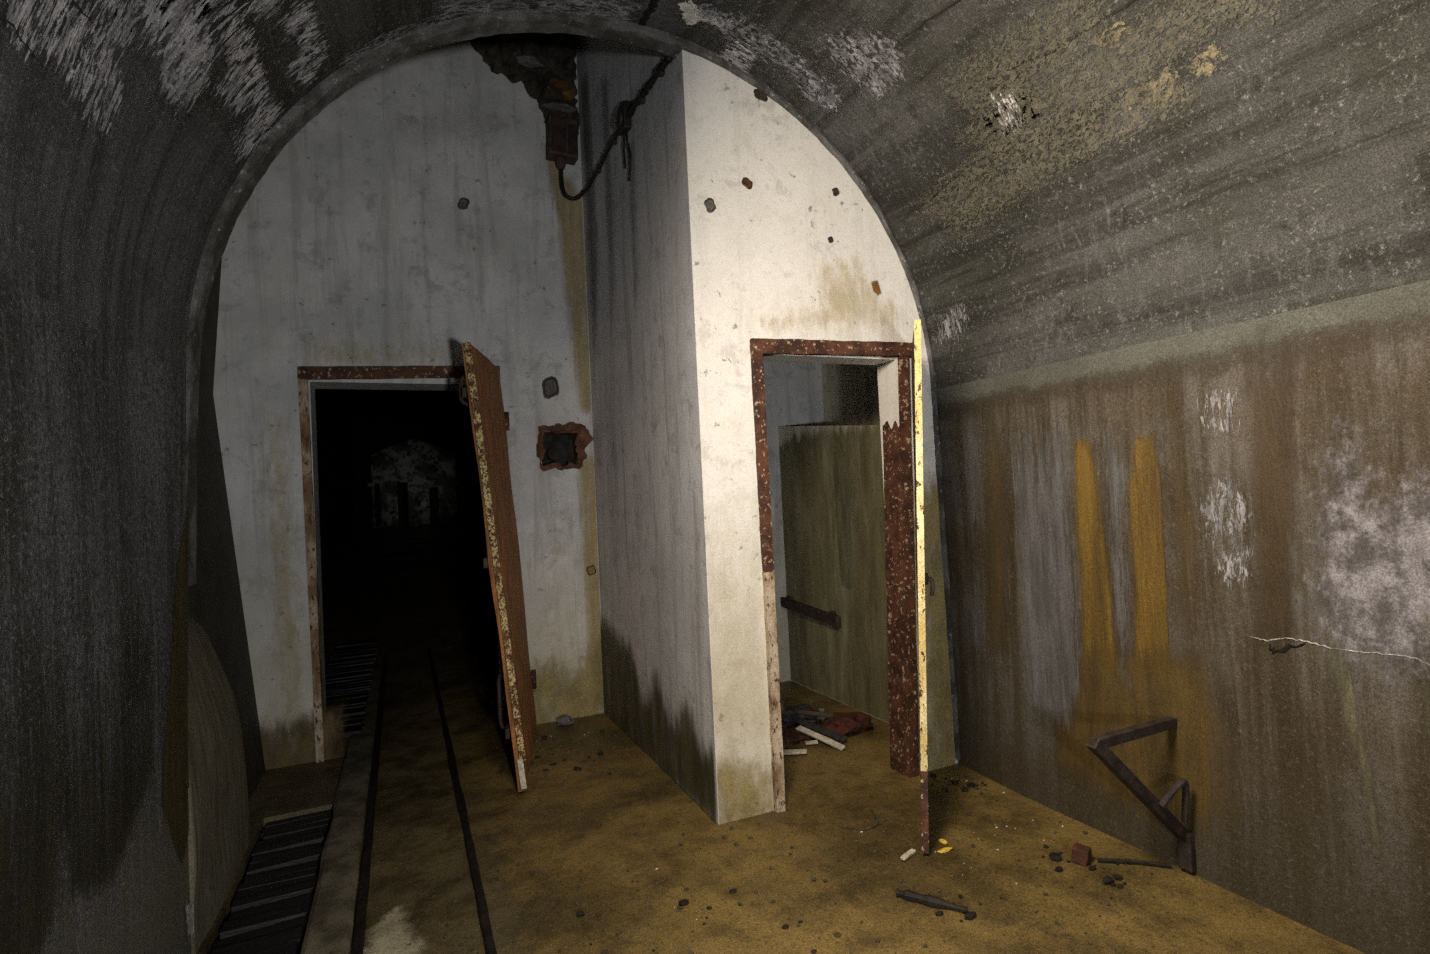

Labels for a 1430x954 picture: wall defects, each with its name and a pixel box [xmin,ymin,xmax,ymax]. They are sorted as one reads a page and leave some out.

damp [678,0,721,27]
crack [1250,636,1429,665]
damp [1311,441,1430,836]
damp [0,511,189,954]
damp [185,901,195,938]